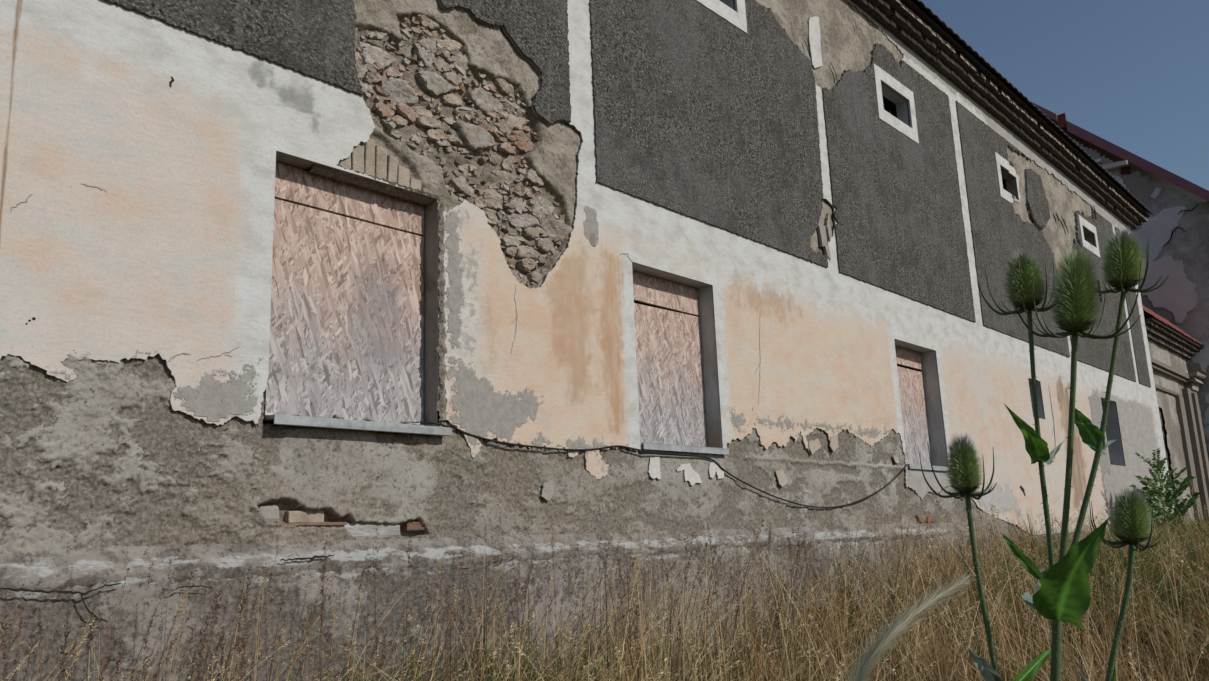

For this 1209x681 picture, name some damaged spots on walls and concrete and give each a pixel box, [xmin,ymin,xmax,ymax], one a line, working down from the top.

peeling [0,0,1027,556]
leakage [444,206,628,455]
flaking render [1007,148,1092,279]
peeling [1131,188,1198,323]
peeling [1192,339,1209,373]
crack [0,583,121,622]